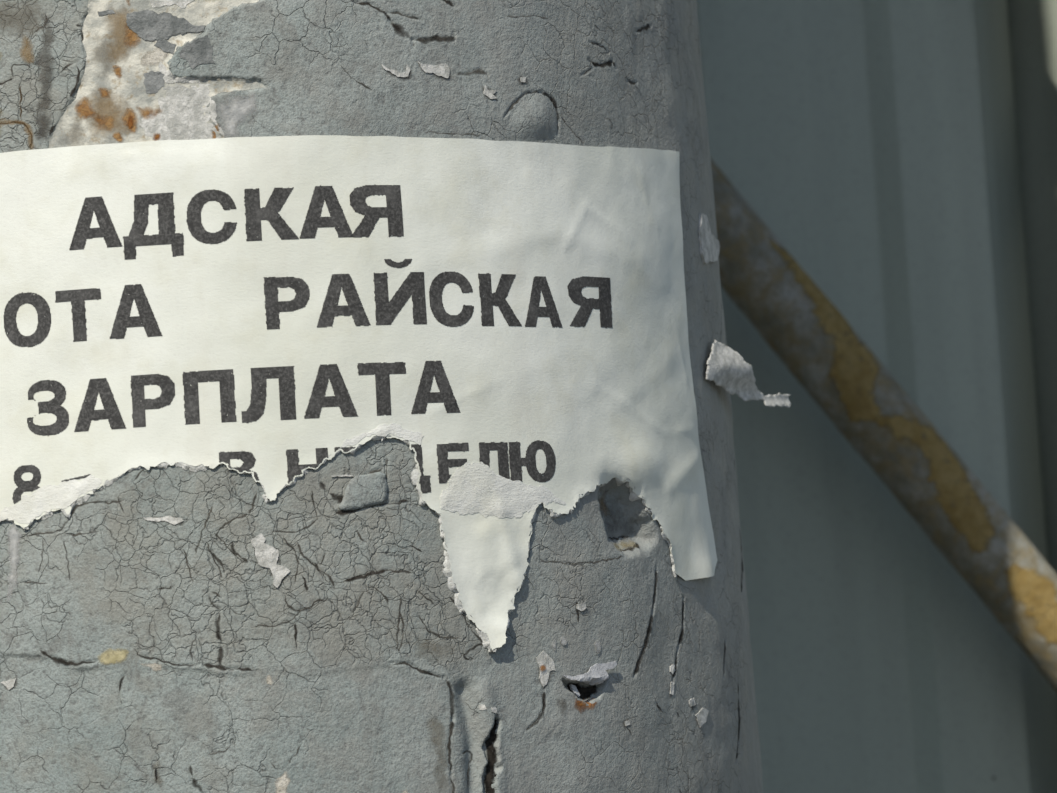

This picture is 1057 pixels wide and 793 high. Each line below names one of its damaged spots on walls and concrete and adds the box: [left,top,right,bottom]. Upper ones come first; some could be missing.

crack [359,2,454,43]
crack [0,64,55,149]
crack [61,60,80,96]
peeling [48,0,267,148]
peeling [381,61,450,79]
crack [584,42,635,84]
crack [25,499,123,584]
crack [136,493,257,671]
crack [543,536,639,565]
crack [41,651,93,666]
crack [255,469,483,793]
spalling [536,636,617,710]